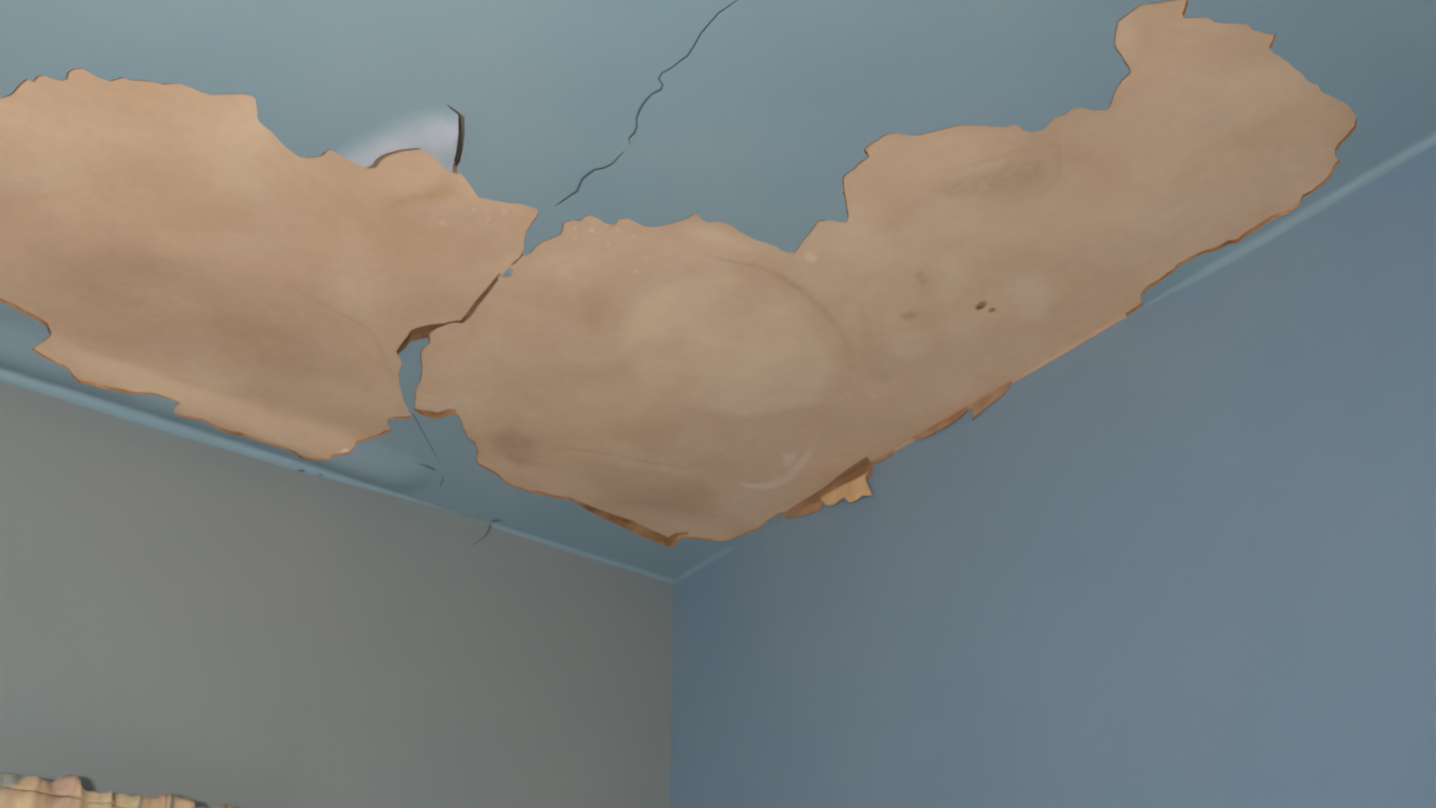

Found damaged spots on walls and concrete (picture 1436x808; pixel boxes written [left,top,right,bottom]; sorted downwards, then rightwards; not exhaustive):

crack [555,0,737,206]
flaking render [0,0,1357,547]